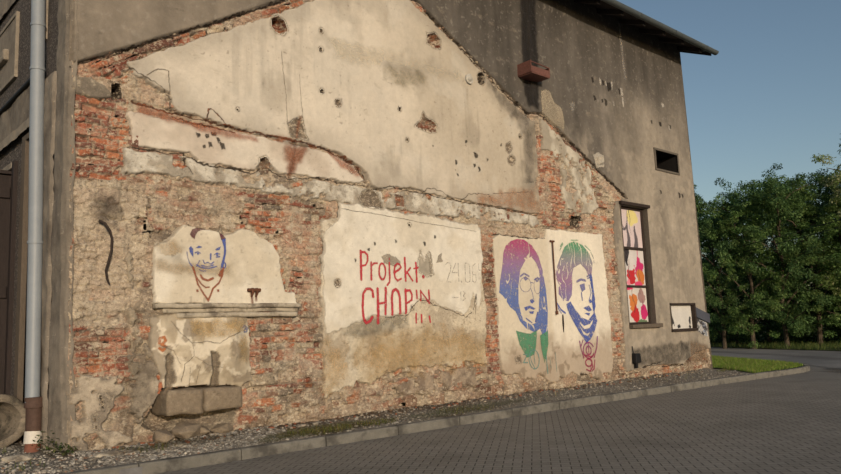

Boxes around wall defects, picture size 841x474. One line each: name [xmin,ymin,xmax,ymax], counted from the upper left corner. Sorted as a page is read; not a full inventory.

spalling [77,0,310,84]
spalling [427,31,441,50]
spalling [591,77,624,107]
rust [277,138,310,174]
spalling [68,96,503,433]
spalling [536,89,711,379]